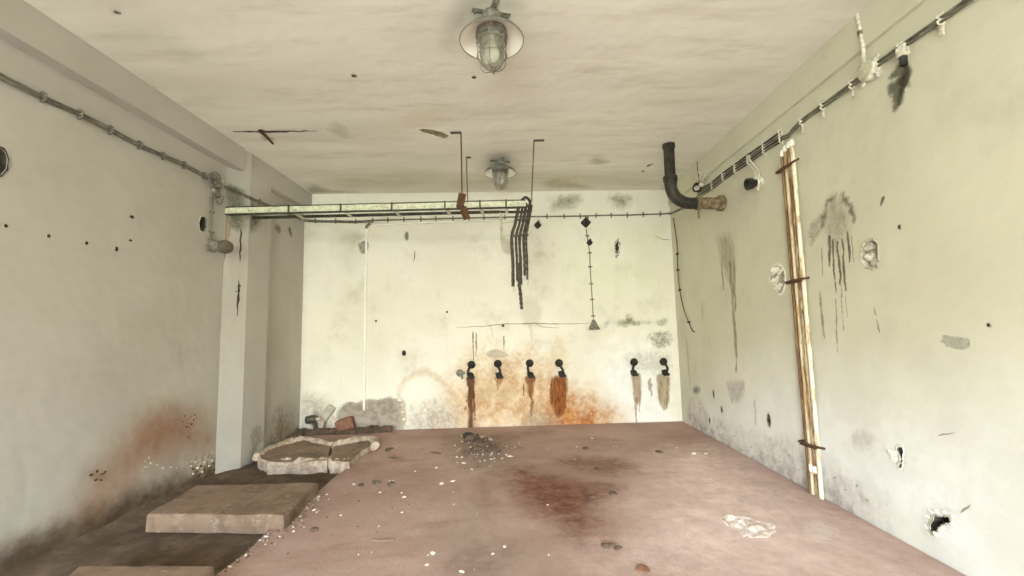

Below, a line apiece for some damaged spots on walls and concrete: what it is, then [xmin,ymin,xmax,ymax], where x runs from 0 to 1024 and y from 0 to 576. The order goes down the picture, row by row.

leakage [885,54,915,116]
crack [235,229,243,315]
flaking render [769,263,786,295]
flaking render [859,238,880,271]
corrosion [421,325,672,427]
leakage [375,184,1024,576]
corrosion [33,374,217,516]
flaking render [682,386,808,489]
flaking render [819,437,963,547]